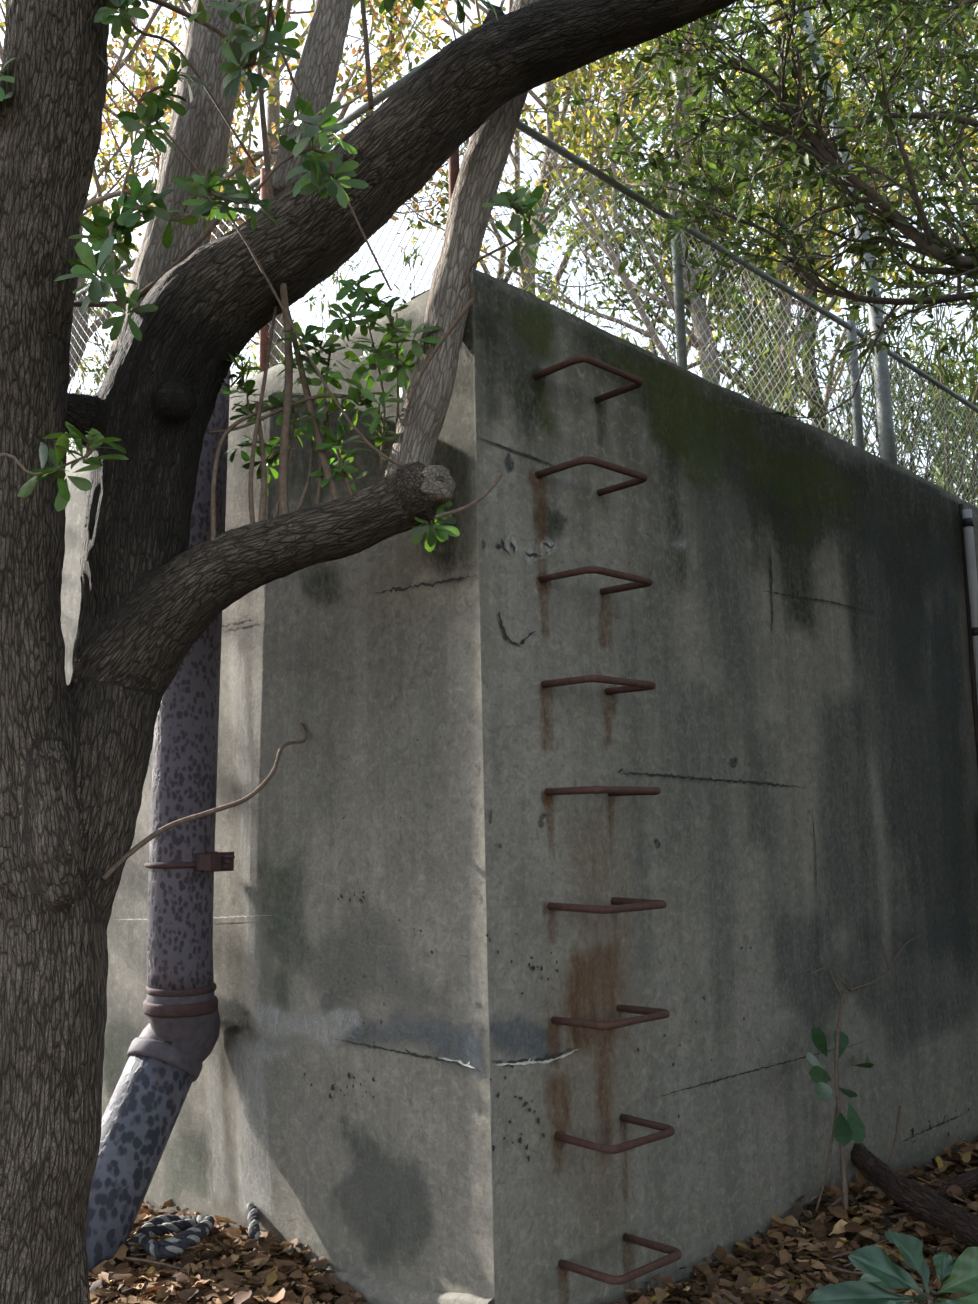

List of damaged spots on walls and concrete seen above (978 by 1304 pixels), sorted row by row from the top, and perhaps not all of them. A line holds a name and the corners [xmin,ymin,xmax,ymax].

crack [497,538,555,557]
crack [373,575,477,594]
crack [222,619,255,628]
damp [588,333,978,1040]
crack [618,769,817,896]
crack [336,1039,578,1072]
damp [166,998,578,1212]